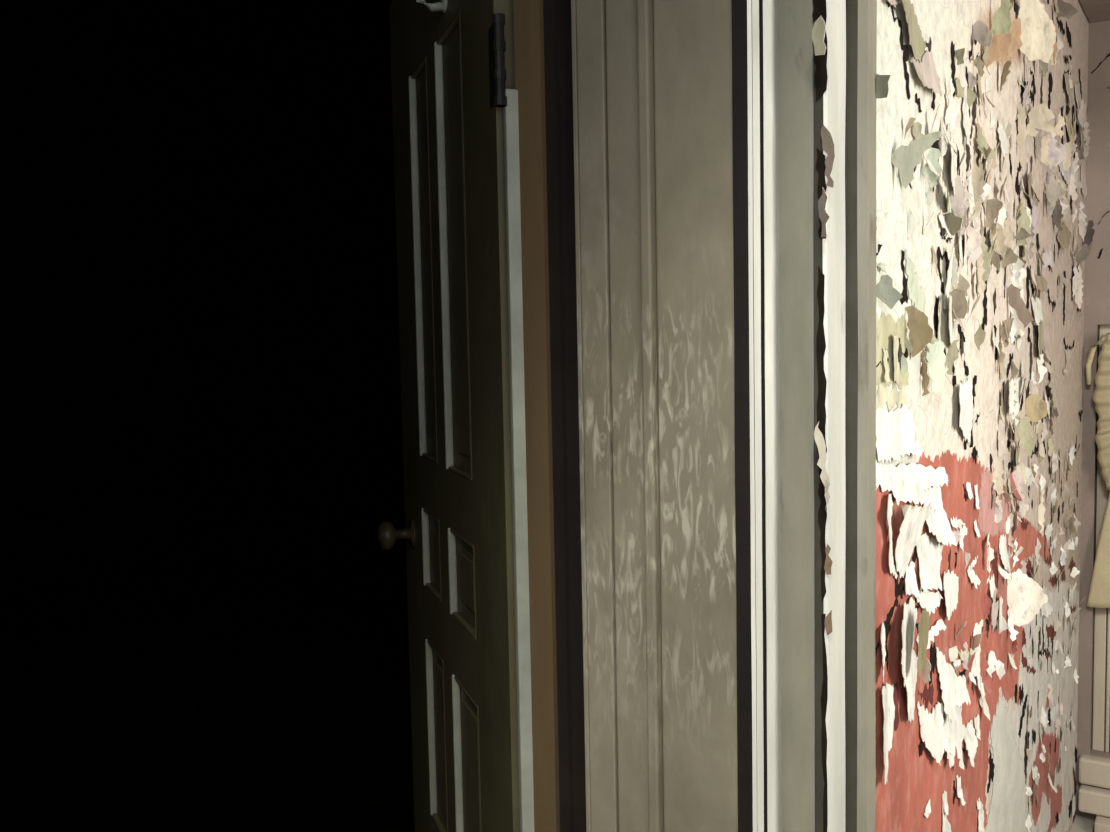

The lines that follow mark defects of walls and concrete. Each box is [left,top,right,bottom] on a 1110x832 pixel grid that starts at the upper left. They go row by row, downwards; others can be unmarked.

peeling [812,0,828,101]
peeling [814,266,833,832]
peeling [816,125,835,239]
peeling [876,0,1103,832]